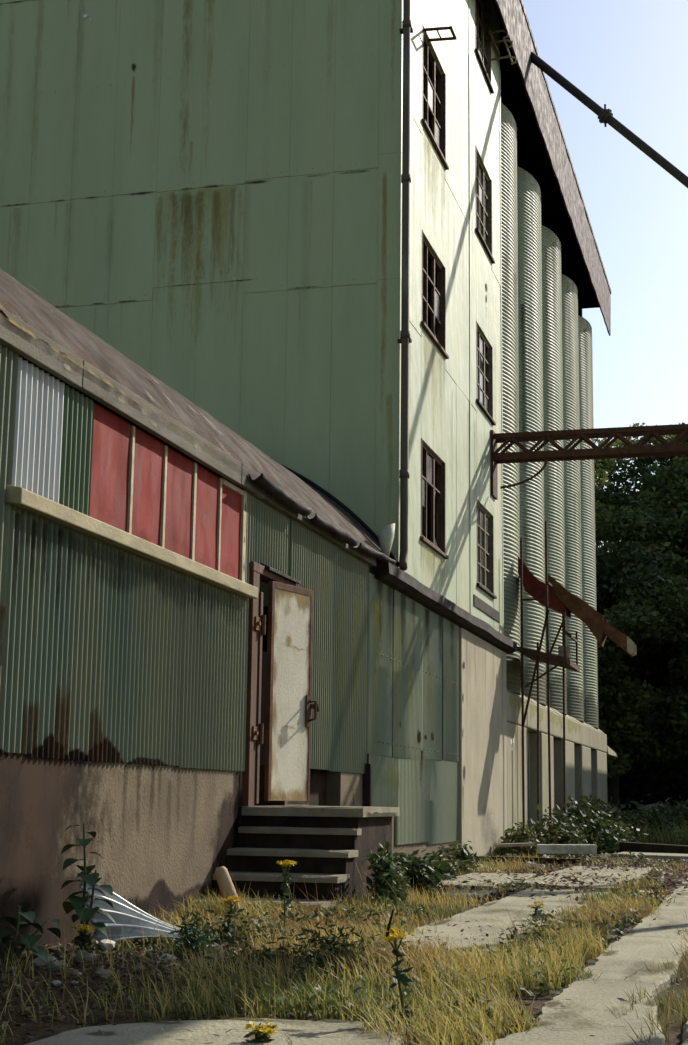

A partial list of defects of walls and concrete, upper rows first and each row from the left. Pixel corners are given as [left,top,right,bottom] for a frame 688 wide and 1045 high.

corrosion [0,735,168,766]
leakage [0,753,111,955]
leakage [125,772,244,923]